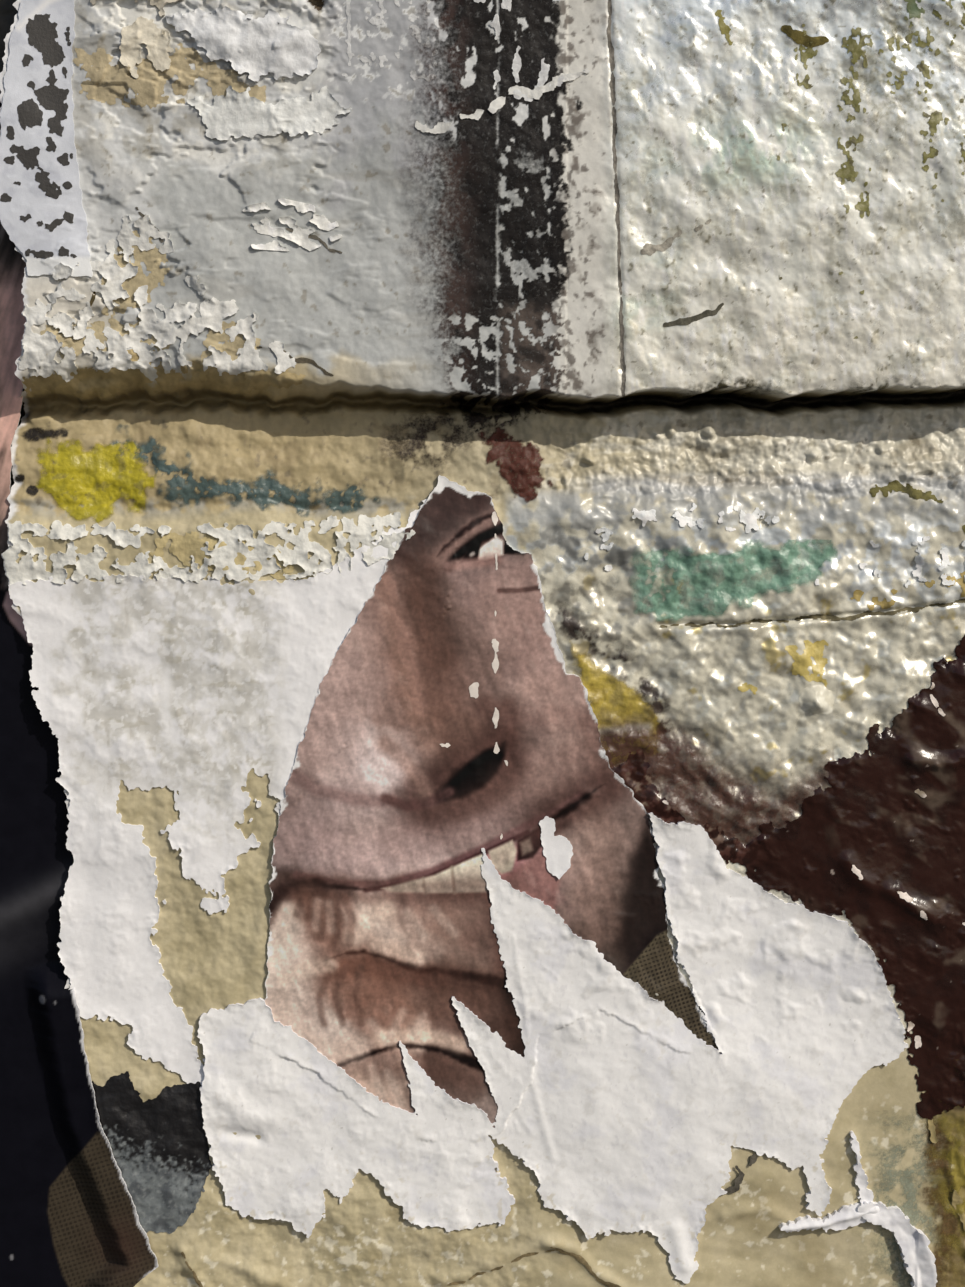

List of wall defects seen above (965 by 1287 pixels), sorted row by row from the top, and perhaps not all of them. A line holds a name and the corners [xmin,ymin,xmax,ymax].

peeling [474,0,512,40]
peeling [415,46,590,134]
peeling [243,198,342,252]
peeling [18,215,306,402]
peeling [2,512,416,585]
peeling [539,816,573,879]
peeling [778,1131,938,1287]